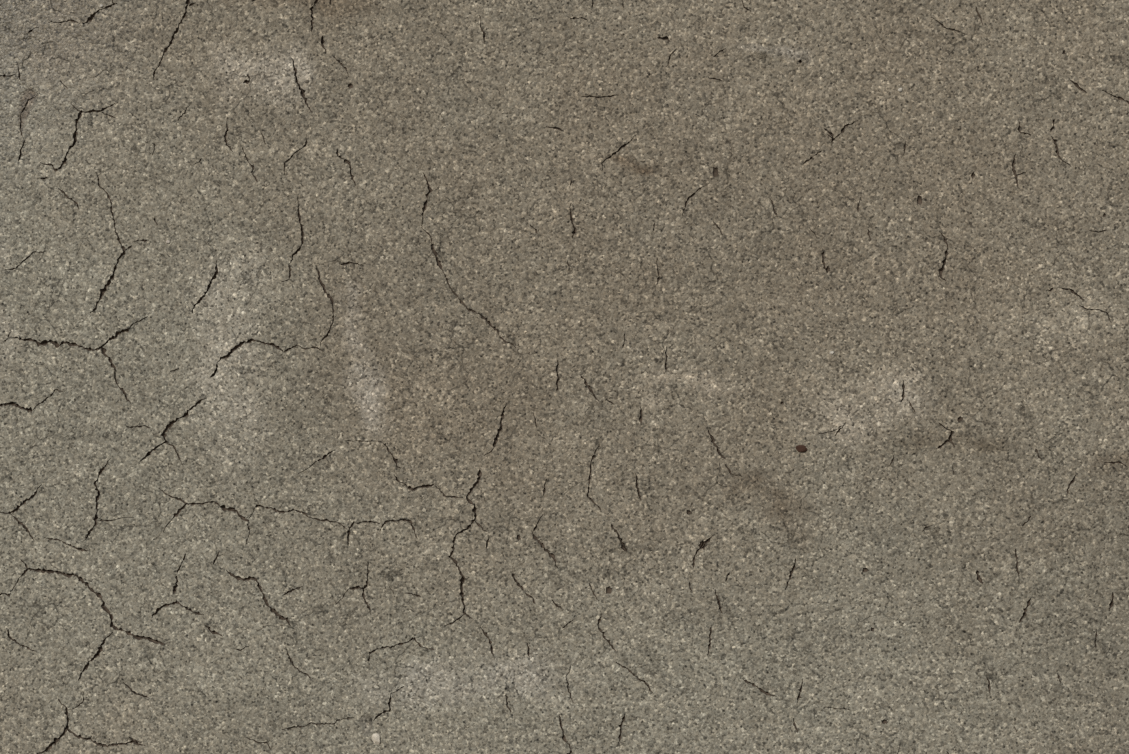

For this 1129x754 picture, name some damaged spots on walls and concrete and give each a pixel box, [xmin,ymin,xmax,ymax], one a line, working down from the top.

crack [28,0,117,33]
crack [153,0,195,80]
crack [0,58,362,465]
crack [421,173,516,348]
crack [556,360,642,423]
crack [0,458,249,754]
crack [159,488,421,679]
crack [298,405,506,662]
crack [512,573,653,693]
crack [586,445,627,552]
crack [689,535,730,656]
crack [247,686,404,750]